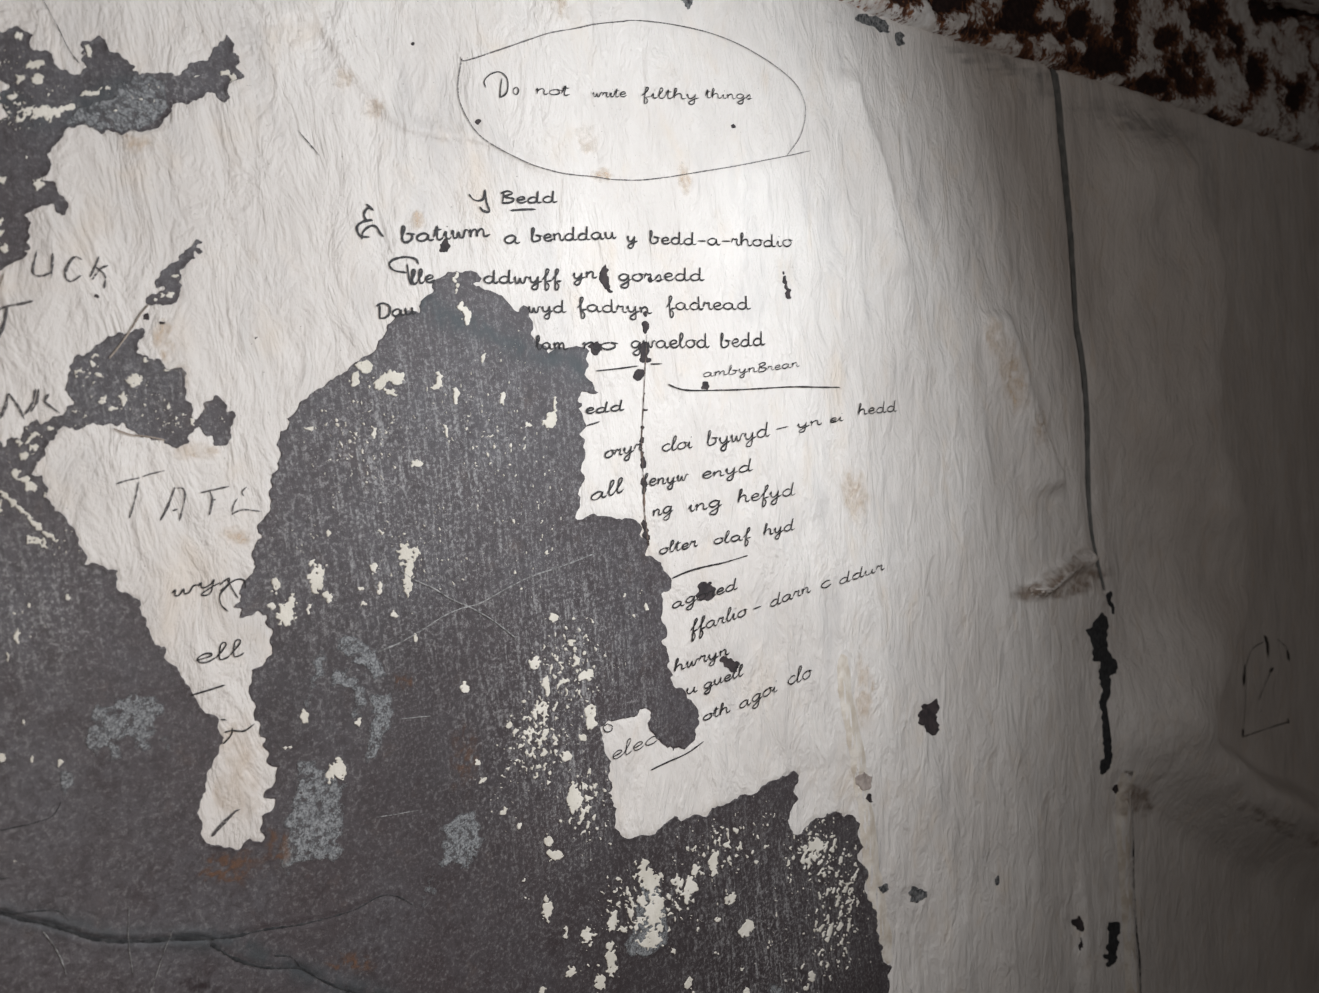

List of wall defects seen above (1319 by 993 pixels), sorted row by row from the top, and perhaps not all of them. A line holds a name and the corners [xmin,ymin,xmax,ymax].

peeling [0,26,244,270]
peeling [0,239,892,993]
peeling [918,699,940,736]
crack [0,894,413,993]
peeling [908,886,927,903]